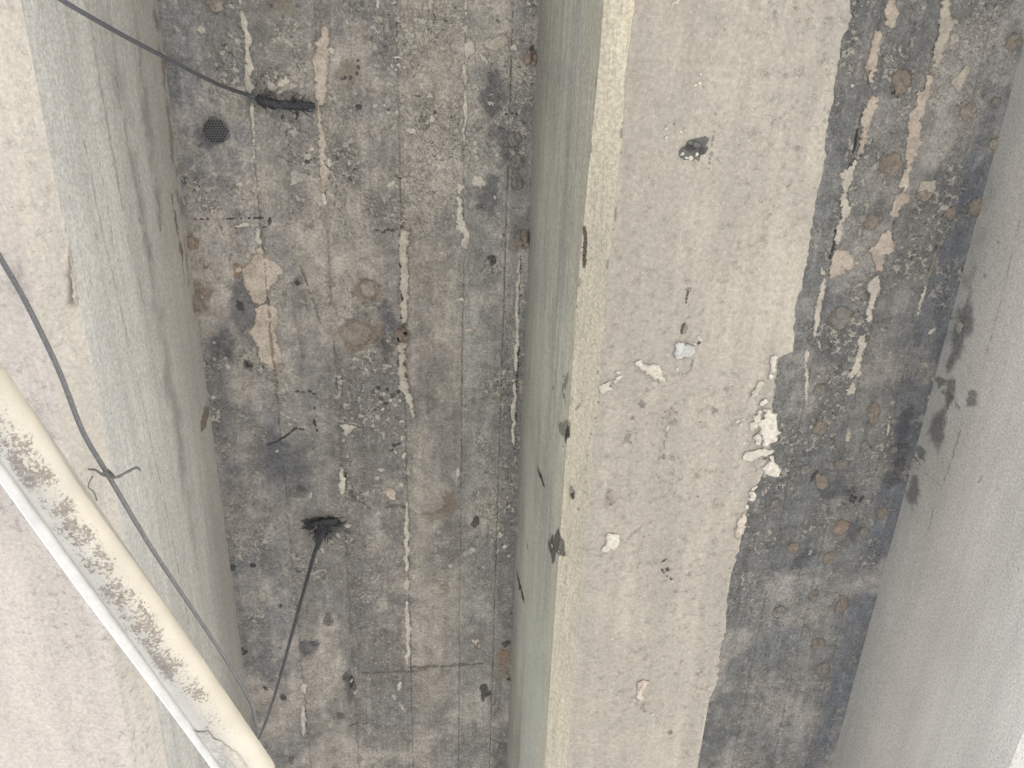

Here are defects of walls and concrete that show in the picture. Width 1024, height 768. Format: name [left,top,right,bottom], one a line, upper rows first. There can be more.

leakage [803,0,958,401]
spalling [918,180,937,195]
peeling [228,227,285,370]
spalling [634,360,667,384]
spalling [673,322,703,376]
spalling [735,355,781,477]
spalling [735,486,758,540]
spalling [601,532,620,552]